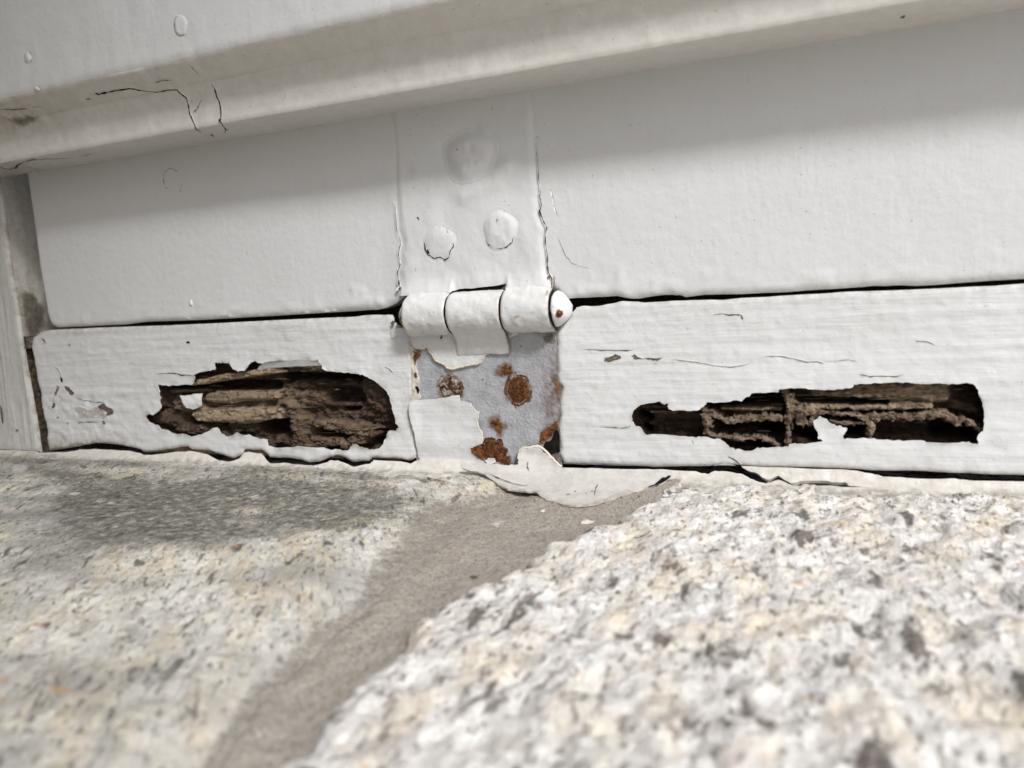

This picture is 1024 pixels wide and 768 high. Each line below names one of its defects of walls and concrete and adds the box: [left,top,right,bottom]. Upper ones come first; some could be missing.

crack [86,65,230,137]
crack [533,134,590,288]
peeling [180,393,202,409]
corrosion [471,416,511,465]
corrosion [496,363,532,404]
peeling [409,335,672,512]
corrosion [540,421,559,443]